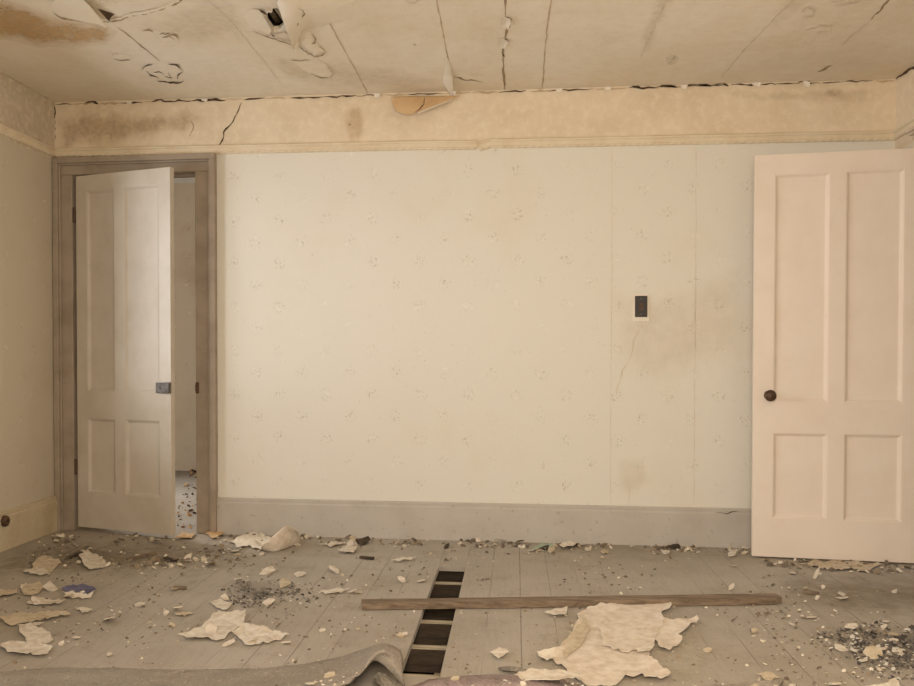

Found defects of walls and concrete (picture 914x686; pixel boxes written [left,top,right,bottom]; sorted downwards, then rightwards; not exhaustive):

peeling [243,8,283,37]
crack [8,0,914,145]